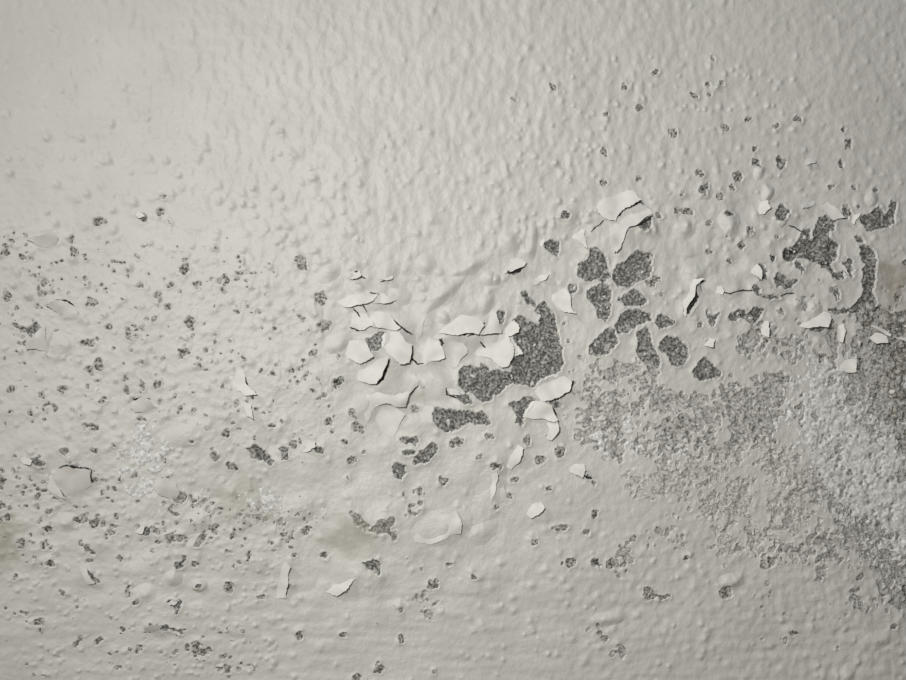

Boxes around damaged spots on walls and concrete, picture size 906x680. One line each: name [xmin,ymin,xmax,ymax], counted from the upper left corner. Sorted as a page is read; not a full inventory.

peeling [132,194,172,224]
peeling [695,169,742,200]
peeling [3,289,59,365]
peeling [0,232,129,331]
peeling [125,245,275,352]
peeling [315,291,327,306]
peeling [83,357,107,404]
peeling [114,360,208,431]
peeling [178,316,284,438]
peeling [337,176,906,622]
peeling [0,447,326,598]
peeling [143,623,255,678]